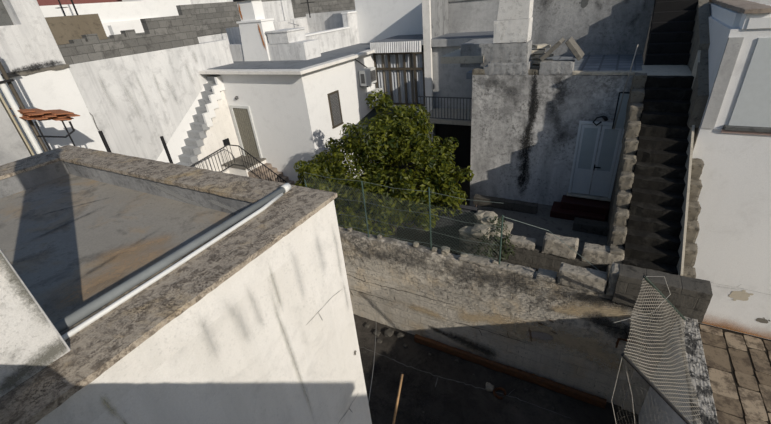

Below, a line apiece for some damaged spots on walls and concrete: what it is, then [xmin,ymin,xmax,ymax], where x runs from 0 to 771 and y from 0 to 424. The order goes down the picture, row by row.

damp [518,70,539,192]
damp [0,340,66,392]
crack [308,274,532,345]
damp [431,327,496,357]